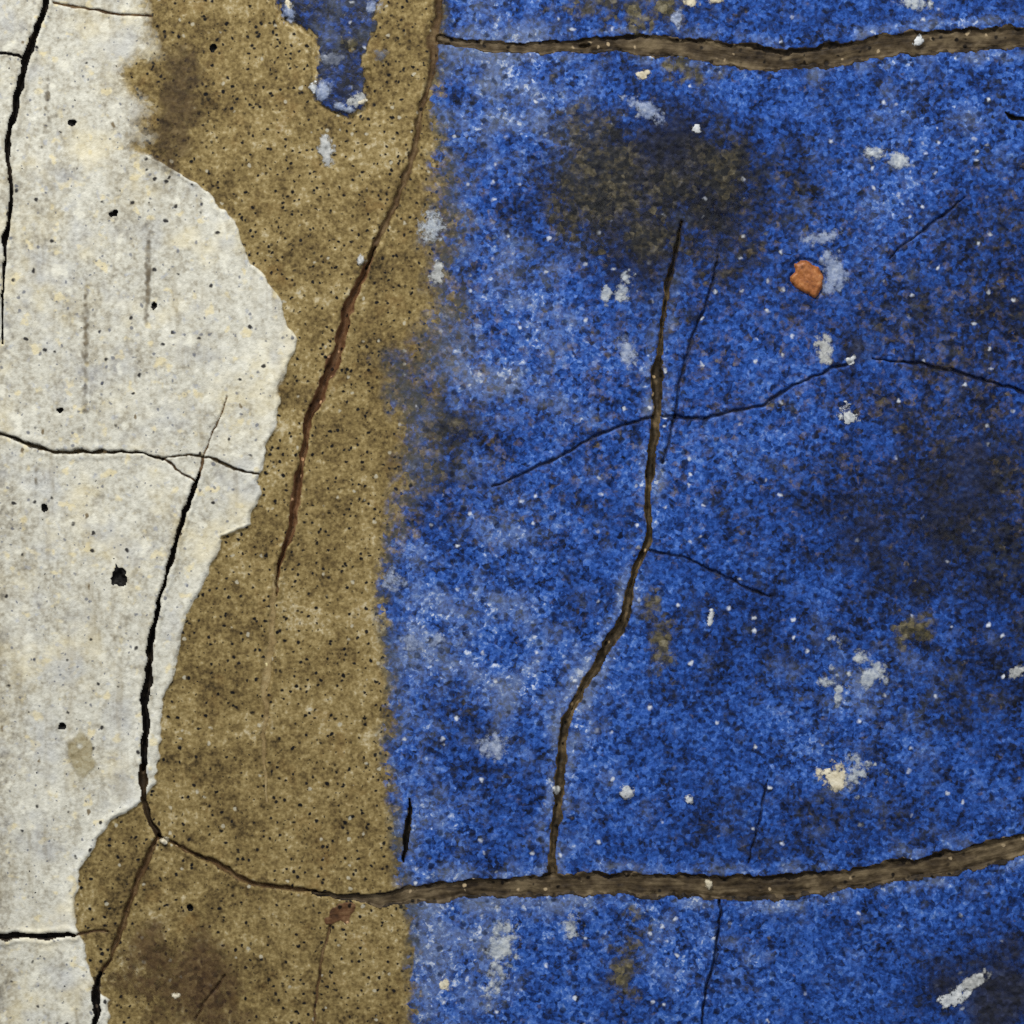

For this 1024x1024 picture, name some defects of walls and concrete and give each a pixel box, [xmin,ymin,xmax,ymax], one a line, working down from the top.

peeling [275,0,385,116]
crack [0,0,152,344]
peeling [317,134,336,166]
water stain [600,106,706,277]
crack [260,0,1024,802]
spalling [110,564,127,586]
crack [0,221,1024,1024]
water stain [930,935,1024,1024]